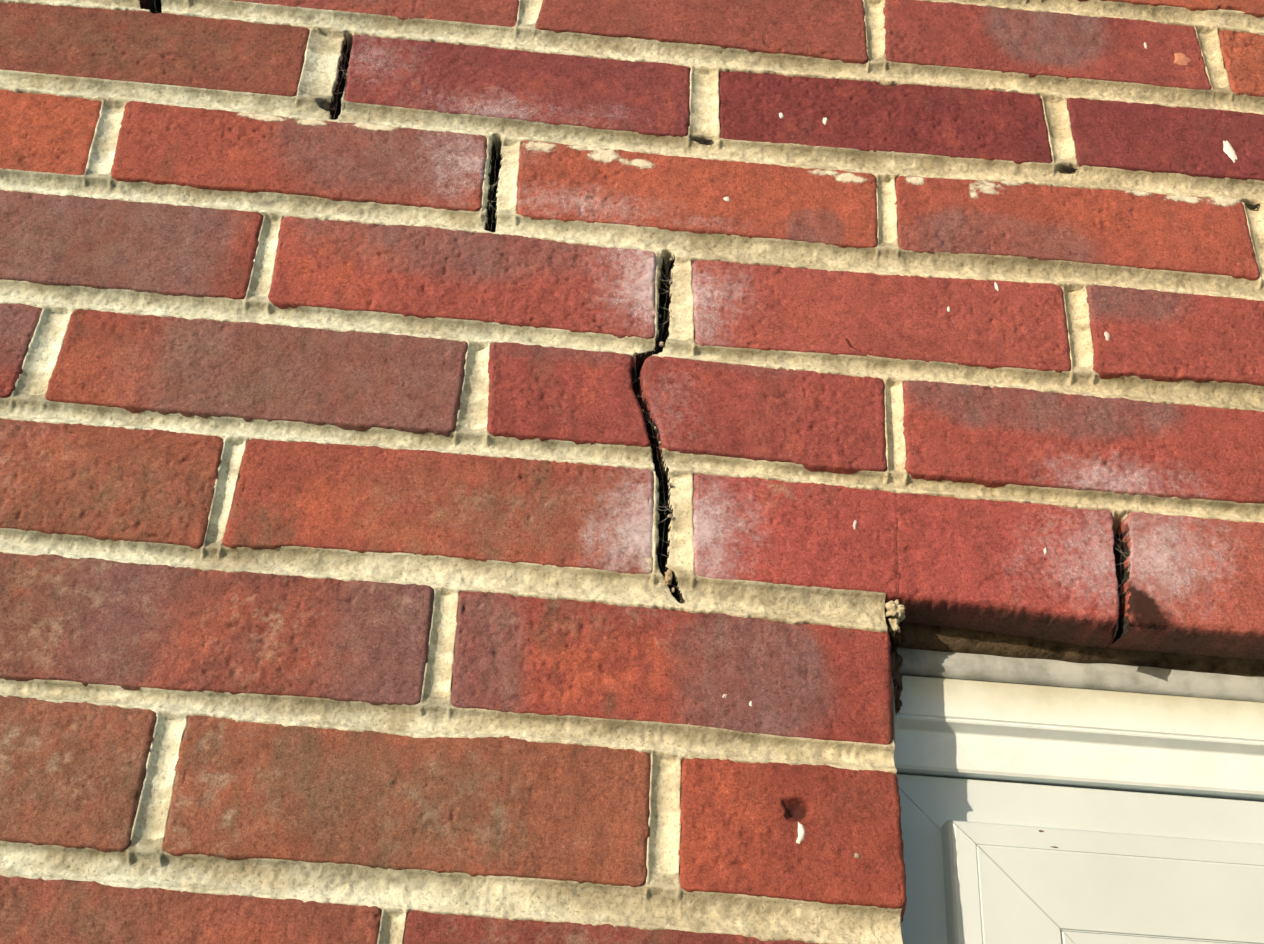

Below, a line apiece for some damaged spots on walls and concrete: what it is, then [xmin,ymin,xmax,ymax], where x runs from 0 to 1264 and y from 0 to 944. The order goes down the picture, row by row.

crack [147,0,162,14]
crack [329,37,350,120]
crack [485,139,503,233]
crack [632,254,685,603]
crack [1111,524,1131,645]